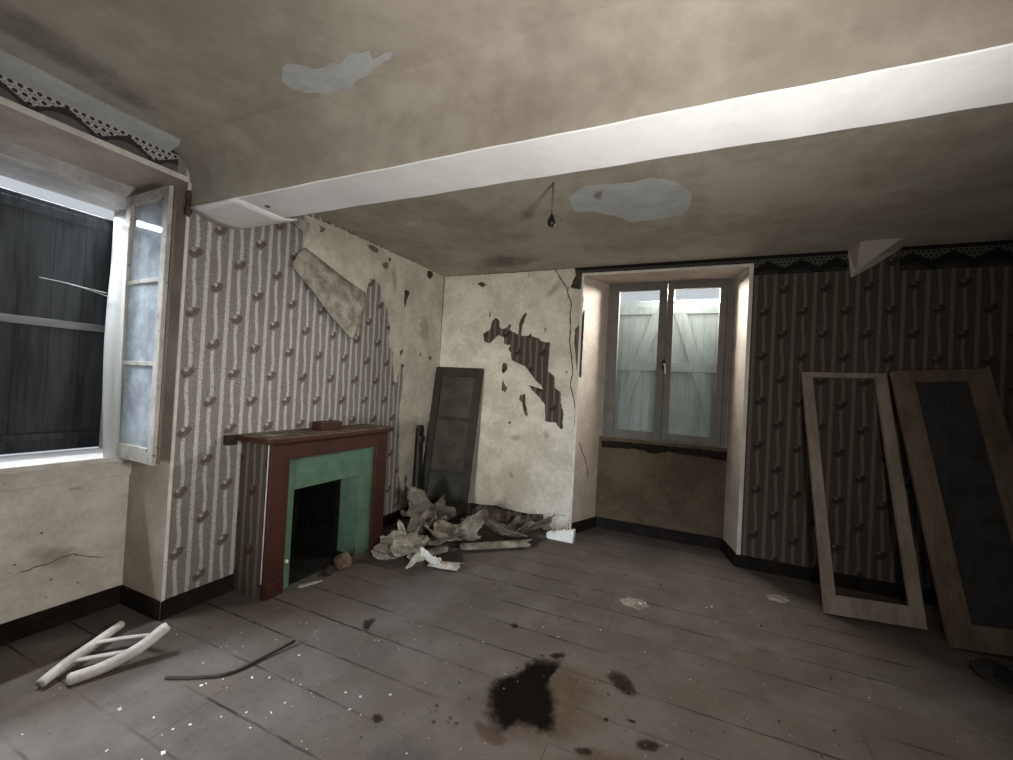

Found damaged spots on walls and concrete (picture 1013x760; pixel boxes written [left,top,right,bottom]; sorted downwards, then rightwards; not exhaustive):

peeling [281,50,393,96]
peeling [568,178,692,222]
peeling [290,215,585,531]
crack [555,269,588,475]